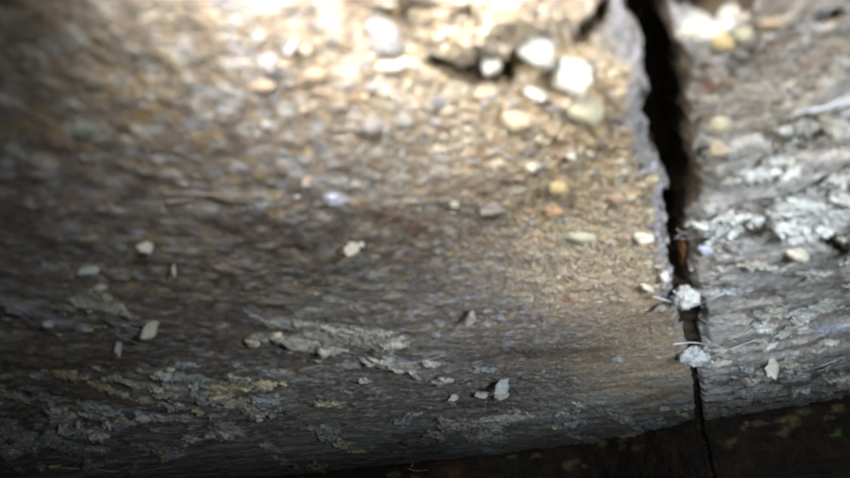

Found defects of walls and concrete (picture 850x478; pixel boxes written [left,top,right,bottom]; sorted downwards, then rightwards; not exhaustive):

crack [626,0,675,163]
crack [662,188,700,347]
peeling [0,361,296,474]
peeling [140,321,159,339]
peeling [313,390,353,409]
peeling [245,309,454,387]
peeling [389,407,536,452]
peeling [463,310,476,326]
peeling [467,366,510,401]
crack [690,367,718,478]